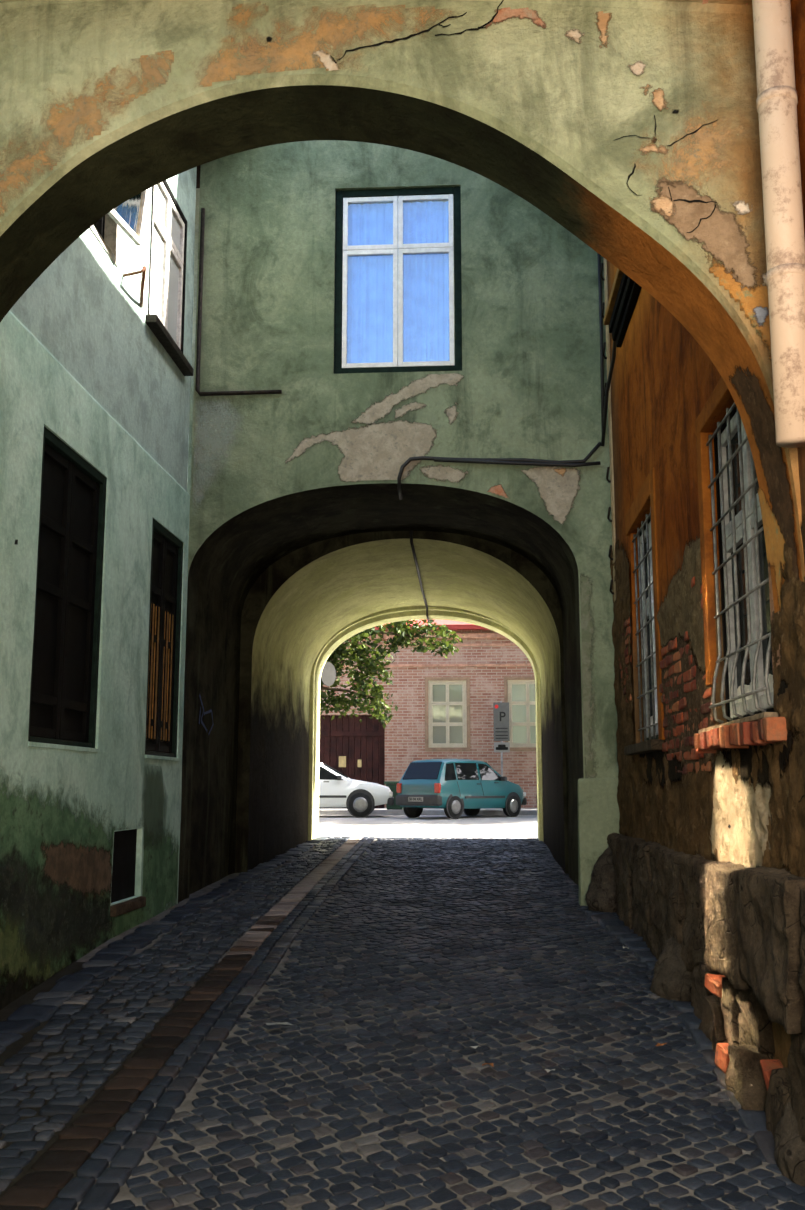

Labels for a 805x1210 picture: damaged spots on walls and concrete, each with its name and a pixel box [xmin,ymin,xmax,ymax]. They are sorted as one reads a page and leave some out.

peeling [199,2,444,87]
crack [330,0,504,63]
flaking render [565,11,612,48]
flaking render [628,61,679,113]
peeling [0,50,174,214]
crack [613,115,719,196]
crack [668,187,717,233]
flaking render [649,176,772,360]
flaking render [285,373,468,483]
flaking render [521,466,581,524]
flaking render [610,365,805,878]
water stain [0,846,114,1010]